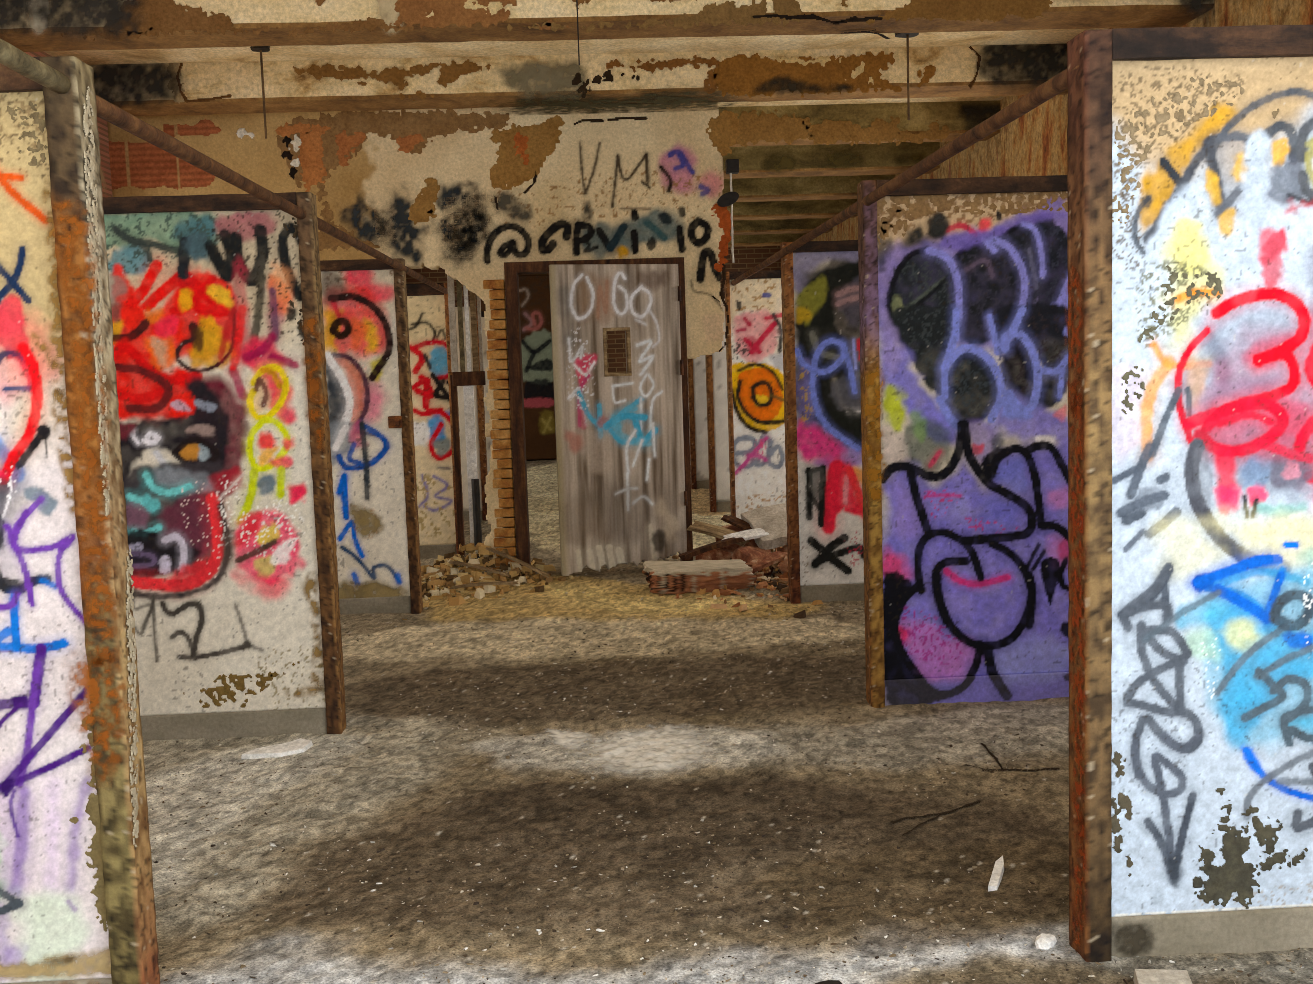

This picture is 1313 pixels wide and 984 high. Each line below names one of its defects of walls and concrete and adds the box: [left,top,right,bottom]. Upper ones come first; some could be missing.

peeling [61,0,802,42]
crack [752,13,890,39]
peeling [866,0,1053,25]
peeling [275,59,565,252]
corrosion [33,190,124,779]
spalling [289,300,304,346]
corrosion [304,317,324,448]
corrosion [864,366,886,500]
spalling [183,661,300,708]
corrosion [296,577,323,696]
corrosion [1067,268,1086,947]
spalling [1193,788,1308,909]